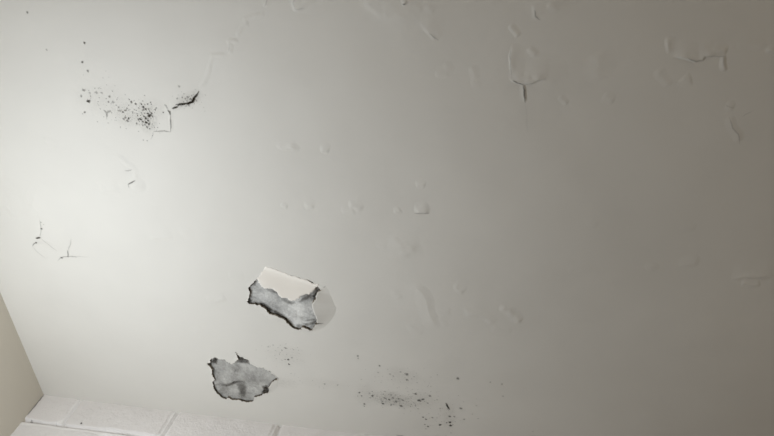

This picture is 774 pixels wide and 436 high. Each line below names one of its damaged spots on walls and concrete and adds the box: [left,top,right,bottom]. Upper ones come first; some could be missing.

peeling [247,266,336,332]
spalling [207,352,278,402]